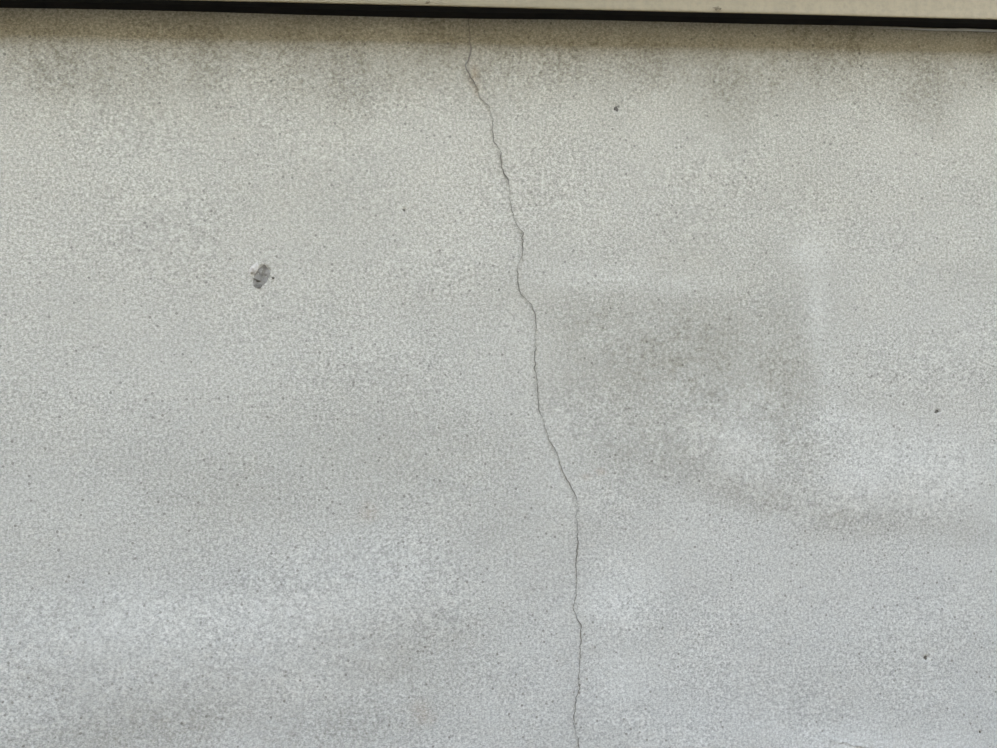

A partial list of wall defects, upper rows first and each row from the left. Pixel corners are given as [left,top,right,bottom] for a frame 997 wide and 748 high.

crack [465,19,582,747]